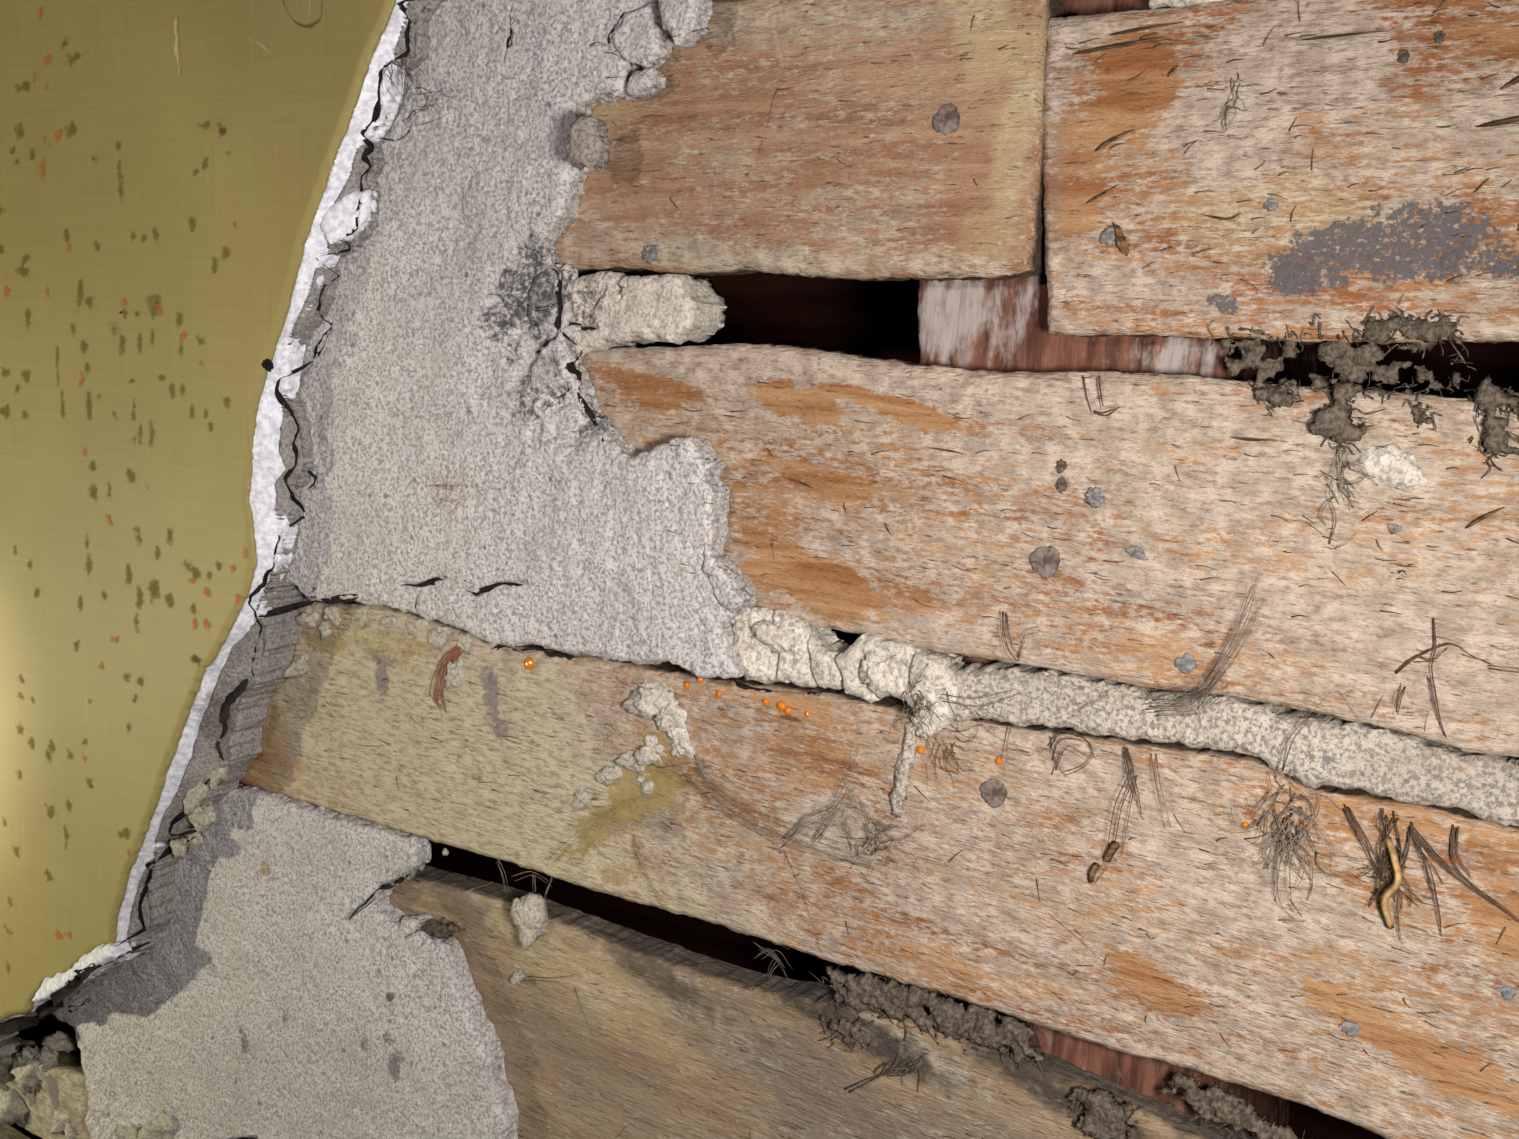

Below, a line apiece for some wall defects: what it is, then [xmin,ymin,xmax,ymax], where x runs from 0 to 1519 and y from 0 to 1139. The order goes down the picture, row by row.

crack [506,19,532,52]
flaking render [612,0,713,99]
flaking render [528,262,580,387]
flaking render [532,402,587,441]
flaking render [1357,443,1428,493]
crack [0,0,416,1036]
flaking render [0,0,448,1047]
crack [403,577,522,608]
flaking render [702,541,752,614]
flaking render [888,722,918,819]